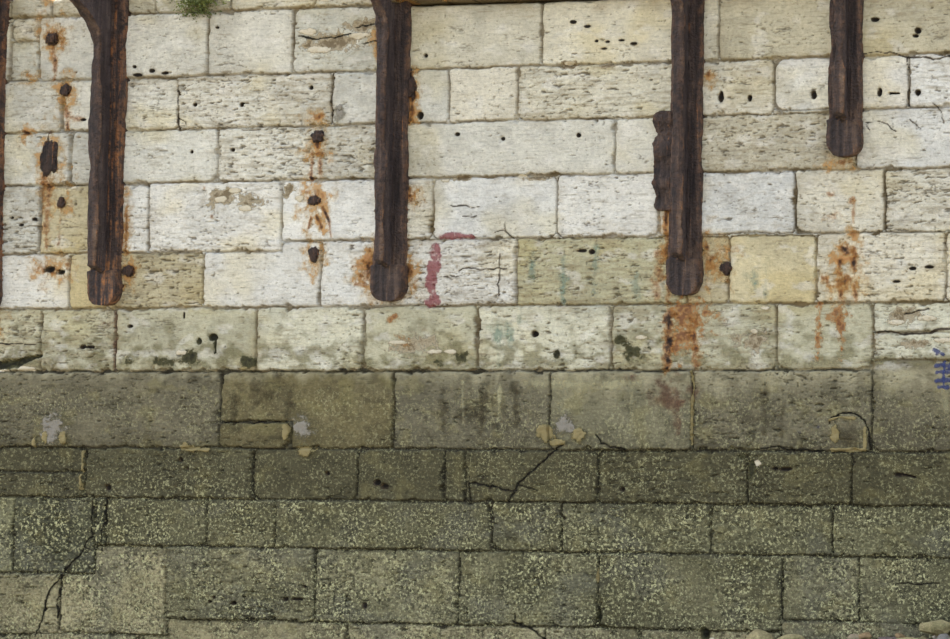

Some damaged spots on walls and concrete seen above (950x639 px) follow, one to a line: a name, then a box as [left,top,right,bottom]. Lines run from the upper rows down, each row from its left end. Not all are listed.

corrosion [36,0,80,130]
corrosion [21,123,73,284]
corrosion [294,138,333,284]
corrosion [351,247,374,305]
corrosion [407,245,422,293]
corrosion [655,211,731,372]
corrosion [815,198,860,362]
crack [468,444,564,503]
crack [35,497,109,636]